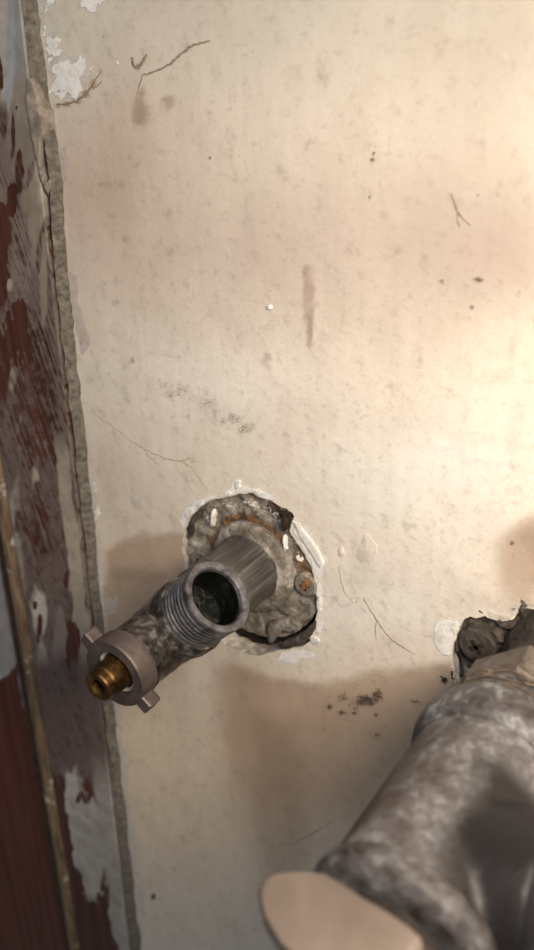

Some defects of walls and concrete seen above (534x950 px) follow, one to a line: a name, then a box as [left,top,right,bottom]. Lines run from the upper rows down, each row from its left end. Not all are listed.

peeling [80,0,103,13]
peeling [42,26,94,100]
peeling [58,146,67,182]
peeling [69,273,90,353]
crack [93,411,207,489]
spalling [178,479,278,528]
corrosion [209,510,282,545]
spalling [273,521,327,665]
corrosion [293,550,313,589]
crack [339,570,415,654]
spalling [434,619,459,656]